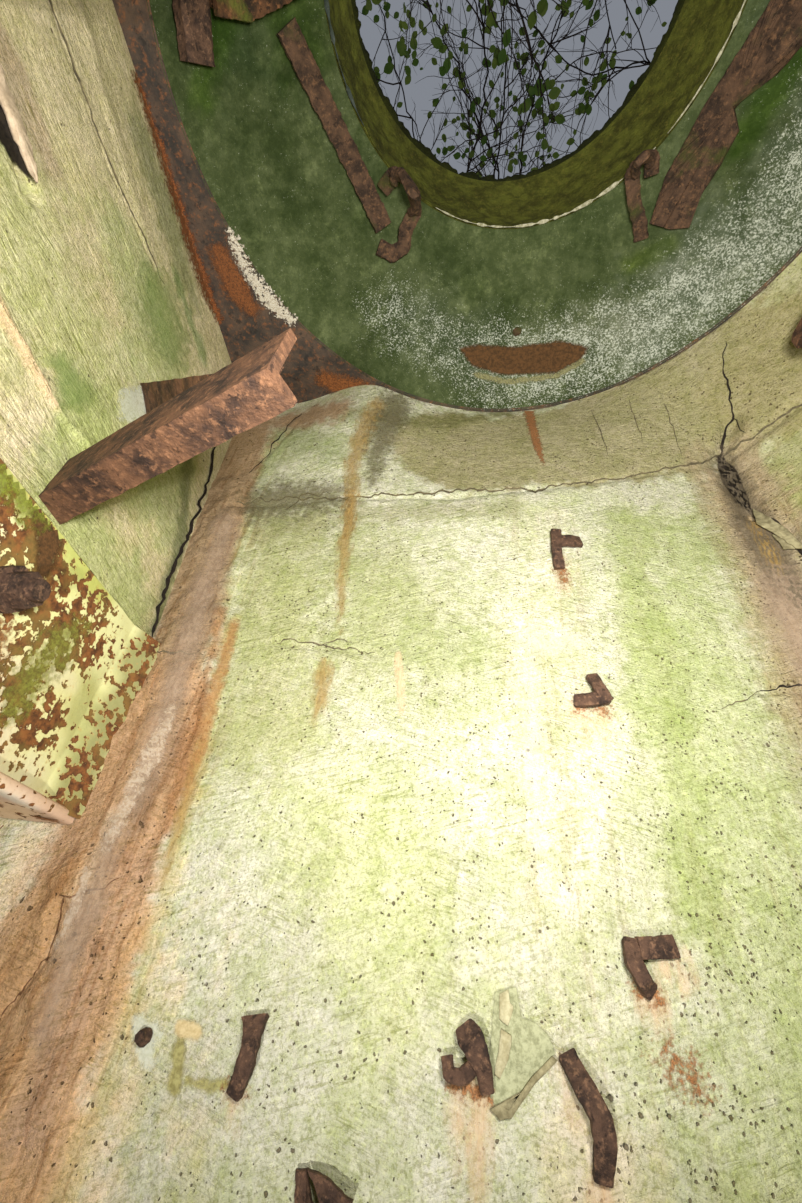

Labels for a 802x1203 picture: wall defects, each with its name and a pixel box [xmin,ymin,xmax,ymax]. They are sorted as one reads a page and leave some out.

spalling [0,64,38,183]
crack [237,414,302,505]
crack [292,342,802,555]
corrosion [31,509,62,577]
crack [152,447,216,655]
corrosion [0,618,19,663]
corrosion [169,623,237,852]
crack [722,683,802,709]
crack [0,878,119,1019]